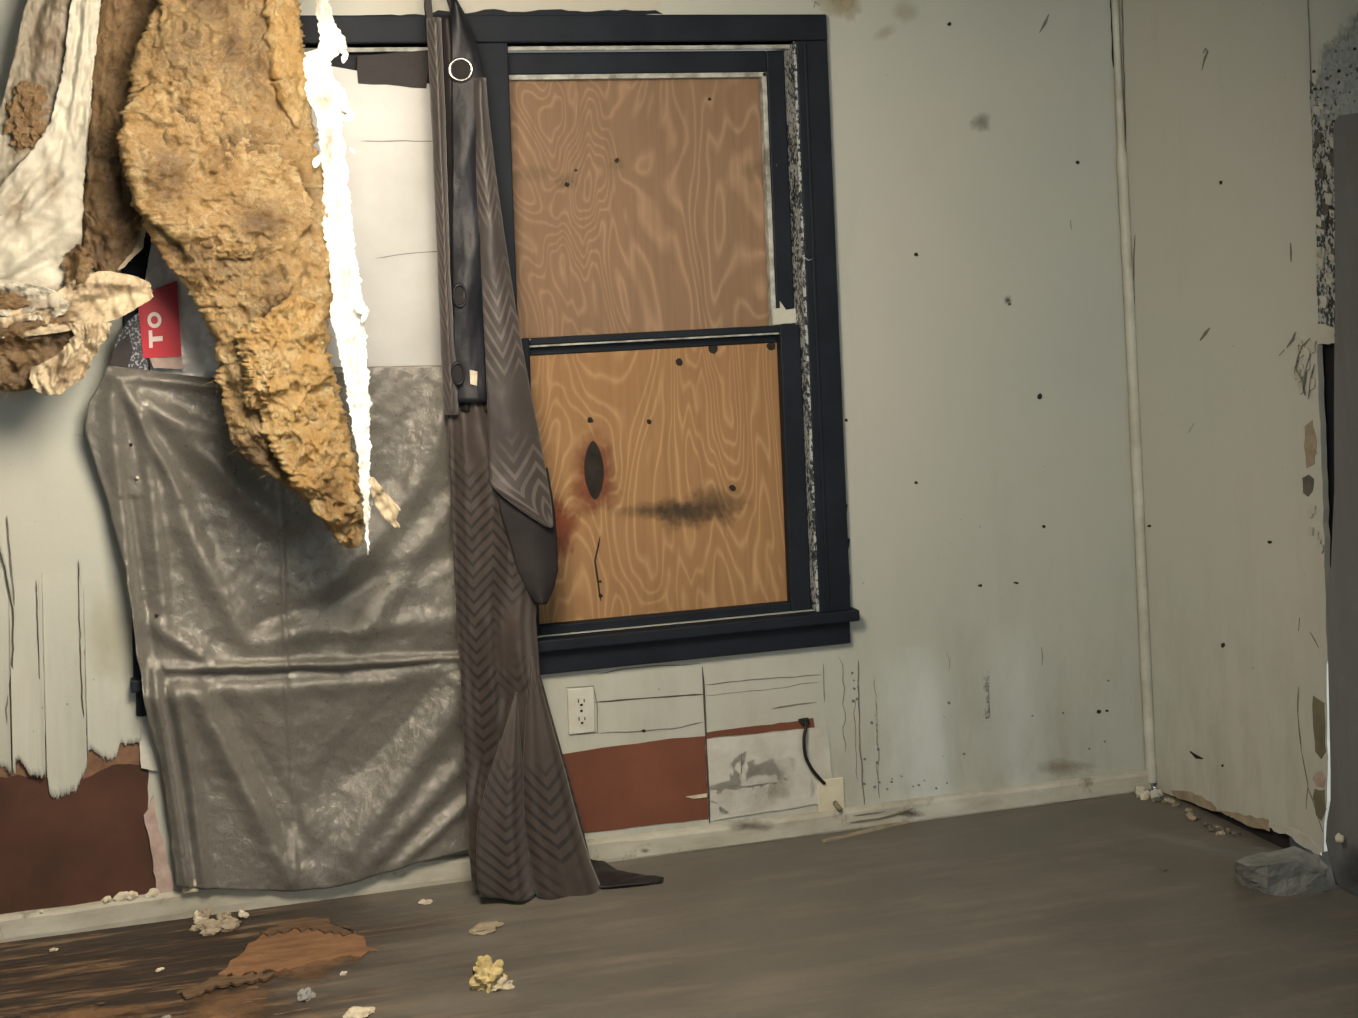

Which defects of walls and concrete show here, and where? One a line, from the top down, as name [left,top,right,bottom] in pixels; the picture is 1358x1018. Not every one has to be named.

peeling [0,572,199,914]
peeling [563,718,815,833]